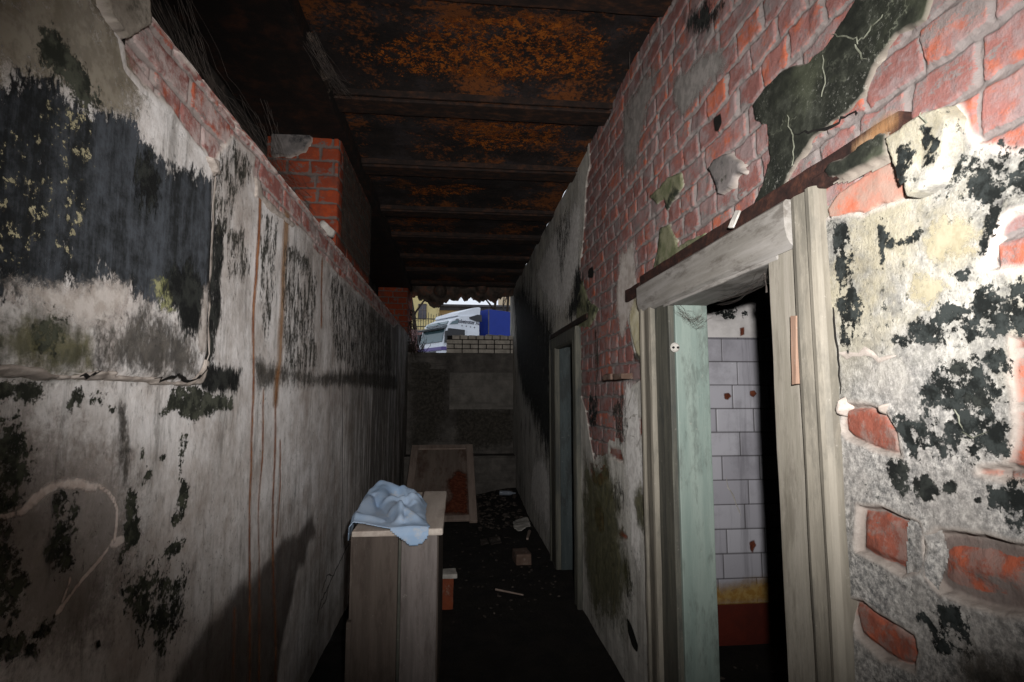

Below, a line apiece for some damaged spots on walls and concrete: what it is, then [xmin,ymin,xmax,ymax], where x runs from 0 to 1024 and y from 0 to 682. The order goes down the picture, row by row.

leakage [66,385,190,659]
leakage [0,20,513,449]
corrosion [249,198,289,682]
corrosion [361,11,608,85]
corrosion [449,121,569,154]
flaking render [578,0,855,489]
crack [787,110,858,166]
crack [821,14,883,97]
flaking render [789,0,1024,229]
leakage [877,137,1024,502]
flaking render [963,323,1024,492]
flaking render [967,193,1024,286]